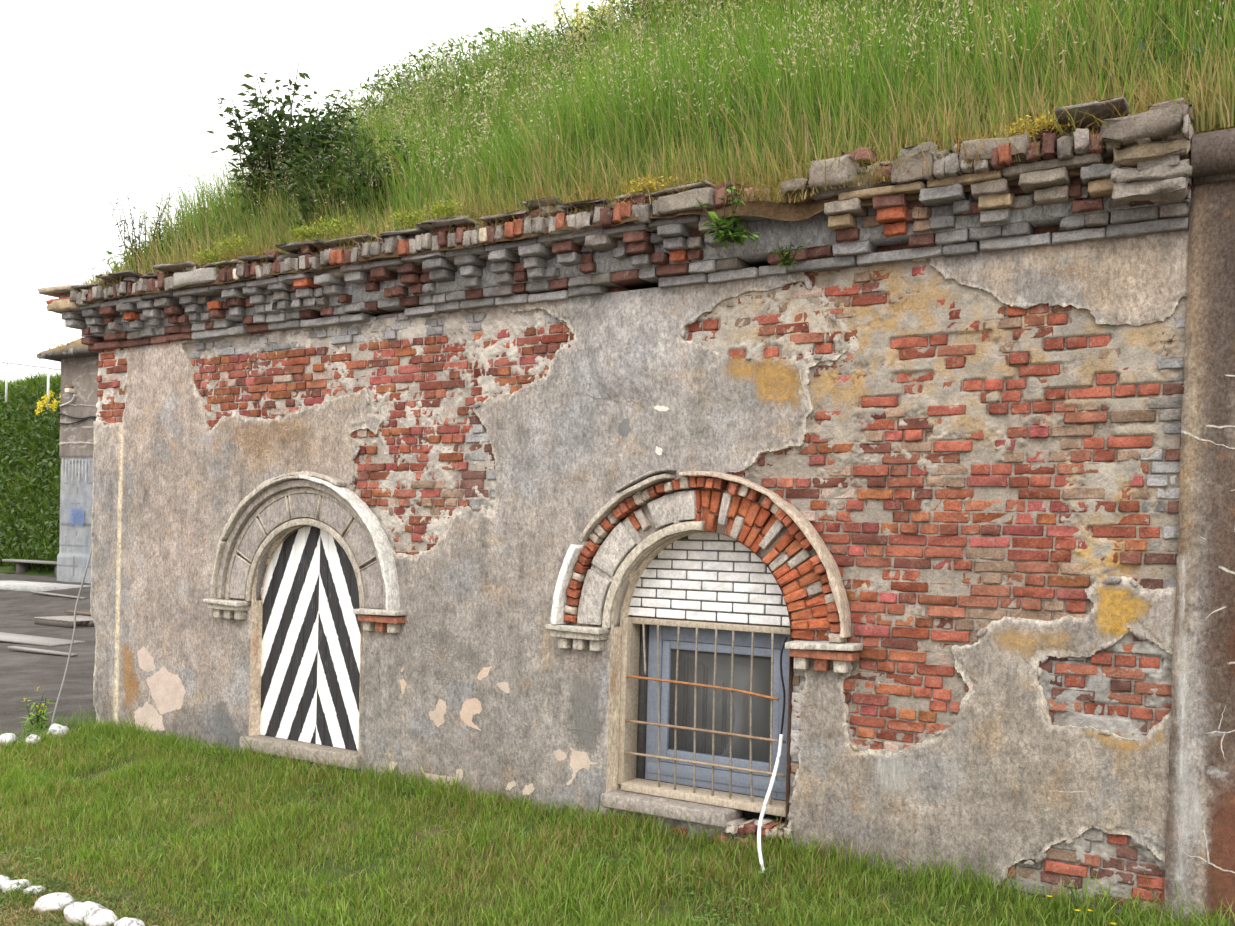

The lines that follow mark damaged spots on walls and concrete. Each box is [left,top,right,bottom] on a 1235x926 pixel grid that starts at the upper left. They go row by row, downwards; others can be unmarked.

flaking render [96,340,128,424]
flaking render [184,307,574,555]
crack [1182,425,1235,449]
flaking render [680,259,1187,753]
crack [1207,706,1235,759]
flaking render [998,828,1165,920]
crack [1181,829,1235,873]
corrosion [1209,794,1235,917]